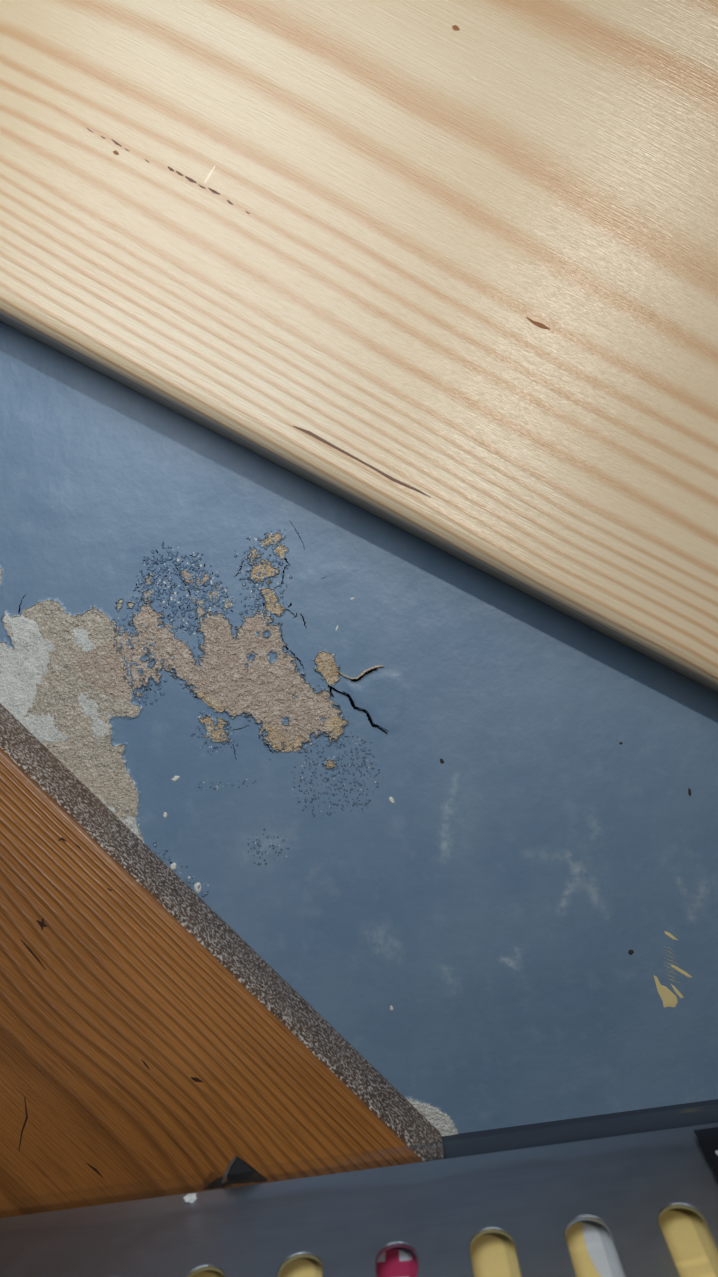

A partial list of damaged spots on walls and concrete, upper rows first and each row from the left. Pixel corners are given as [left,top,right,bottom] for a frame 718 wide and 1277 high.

peeling [0,529,383,896]
crack [234,521,388,733]